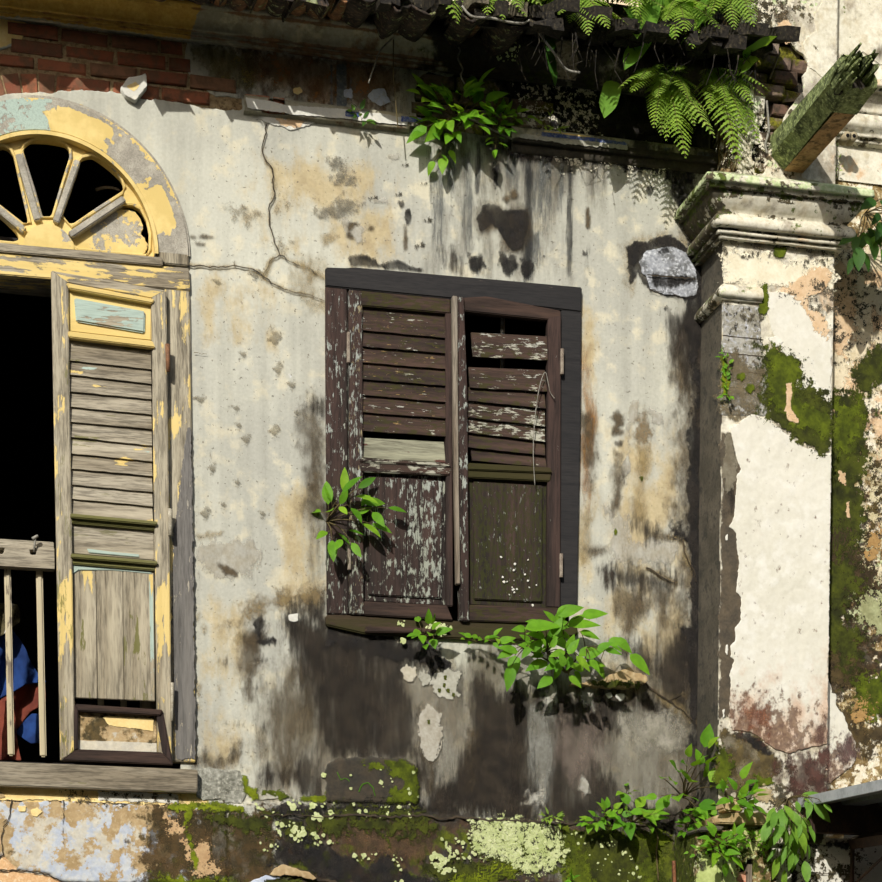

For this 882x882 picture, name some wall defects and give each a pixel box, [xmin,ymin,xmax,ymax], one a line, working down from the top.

crack [188,124,324,301]
spalling [0,22,628,150]
leakage [420,132,699,279]
leakage [497,79,699,147]
spalling [626,235,701,300]
spalling [750,0,838,174]
flaking render [801,138,836,184]
flaking render [712,241,882,784]
leakage [138,286,701,882]
leakage [828,627,882,761]
leakage [710,722,833,804]
spalling [0,789,213,882]